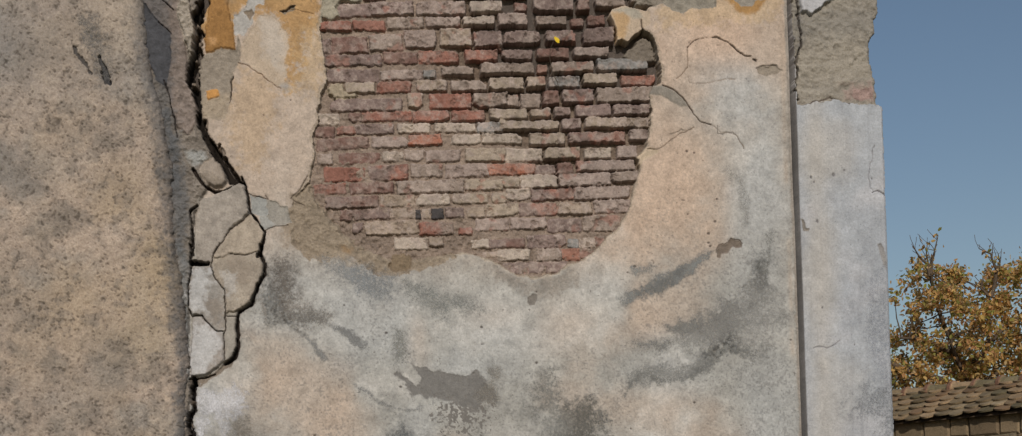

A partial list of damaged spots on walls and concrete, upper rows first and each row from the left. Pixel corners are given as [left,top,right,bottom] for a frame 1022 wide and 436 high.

crack [654,37,758,151]
flaking render [756,64,783,77]
crack [793,0,803,101]
flaking render [787,0,881,107]
crack [188,0,308,436]
flaking render [143,0,767,436]
leakage [622,234,786,396]